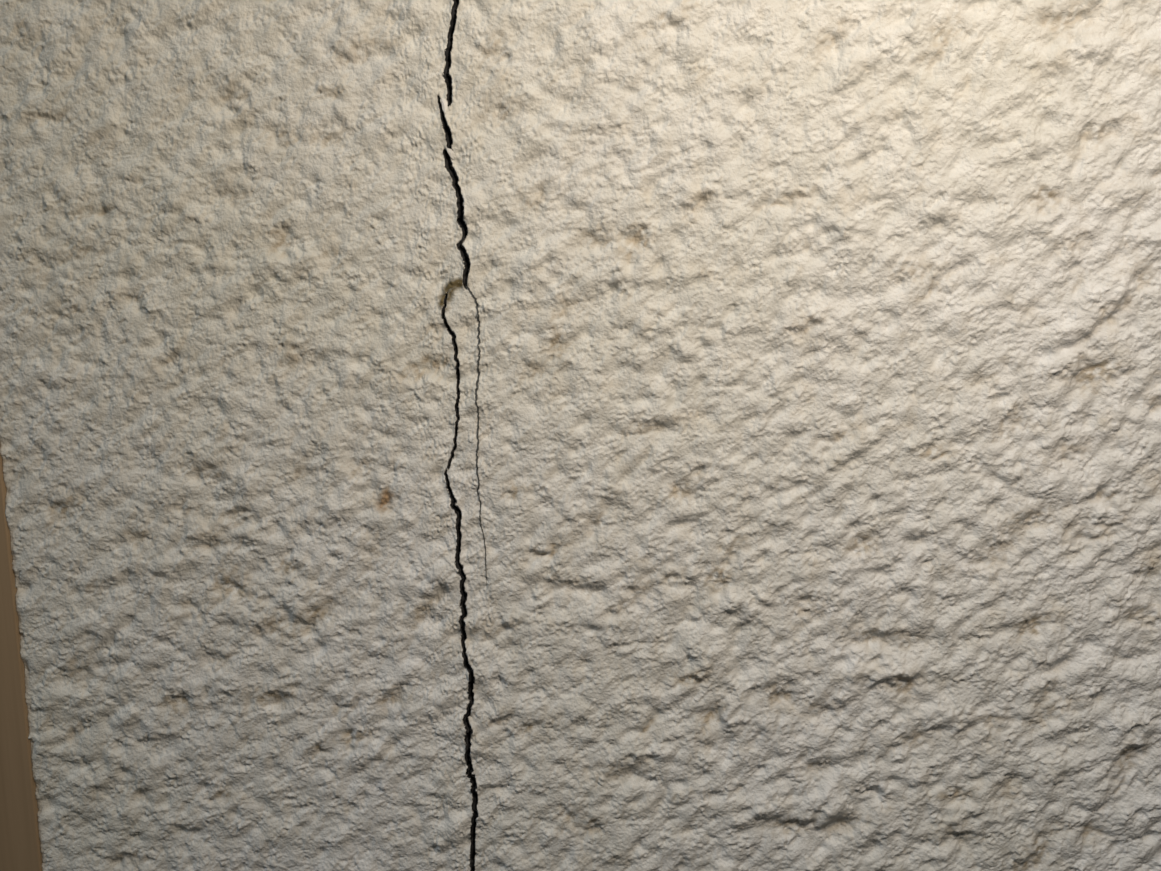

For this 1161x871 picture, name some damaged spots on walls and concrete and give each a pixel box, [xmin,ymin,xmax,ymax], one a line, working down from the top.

crack [437,0,487,871]